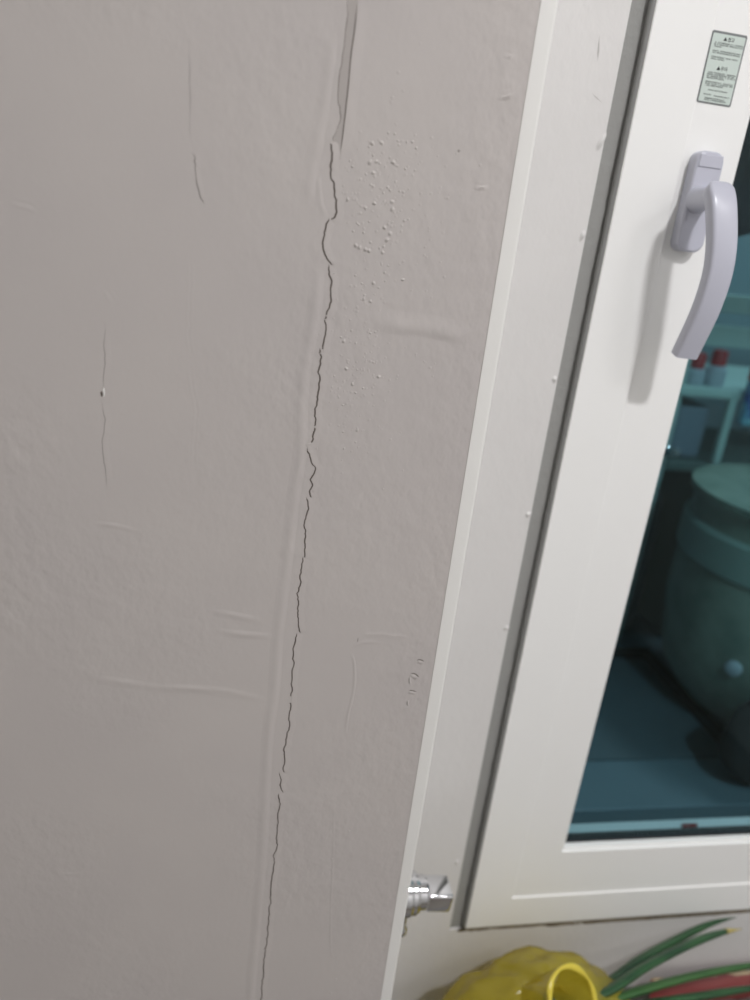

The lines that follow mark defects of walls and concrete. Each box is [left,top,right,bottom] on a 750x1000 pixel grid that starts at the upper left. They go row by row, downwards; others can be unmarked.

crack [260,141,345,1000]